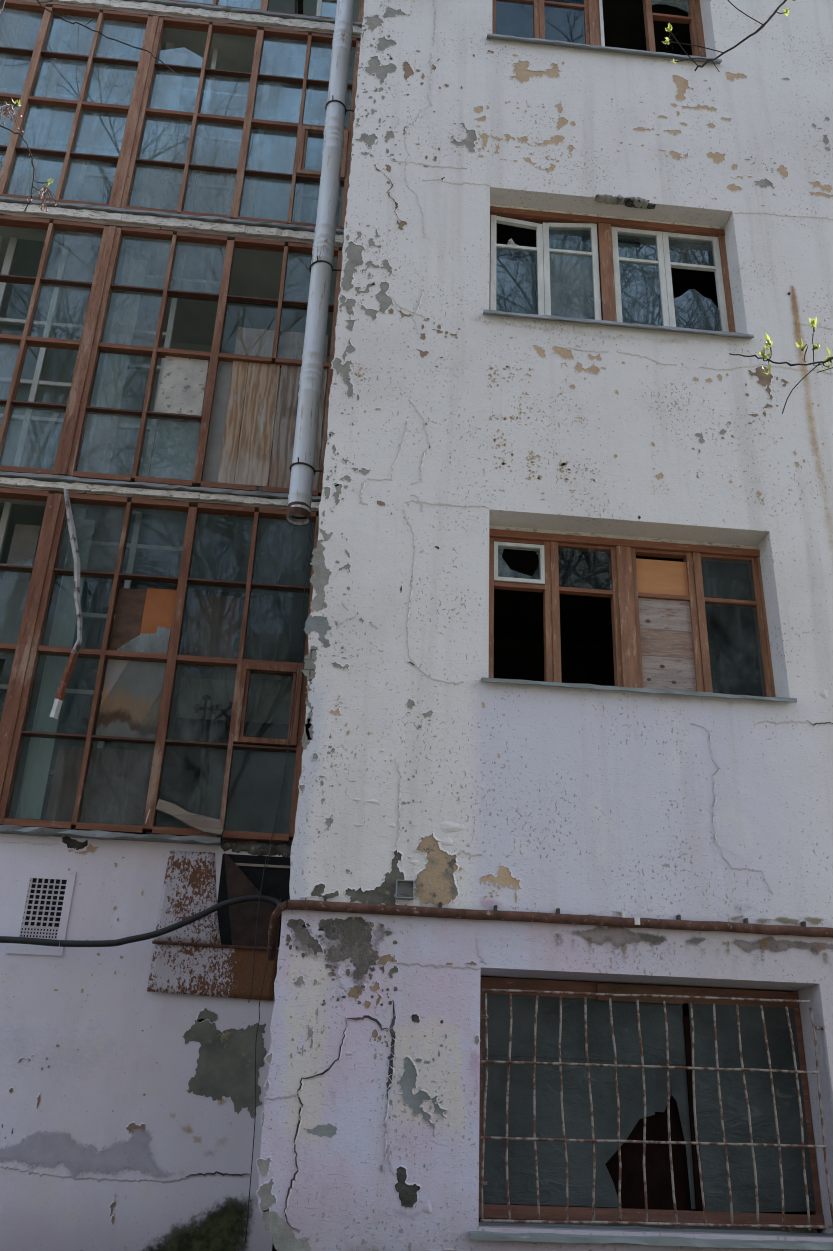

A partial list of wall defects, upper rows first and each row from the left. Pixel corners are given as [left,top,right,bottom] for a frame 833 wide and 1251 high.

peeling [351,0,441,231]
peeling [331,221,460,434]
rust [791,286,806,374]
crack [337,399,489,685]
crack [690,723,773,894]
rust [147,850,291,1001]
flaking render [282,775,462,1063]
crack [399,939,486,971]
crack [0,1166,250,1184]
flaking render [183,1006,273,1127]
crack [265,966,398,1233]
flaking render [378,1163,422,1210]